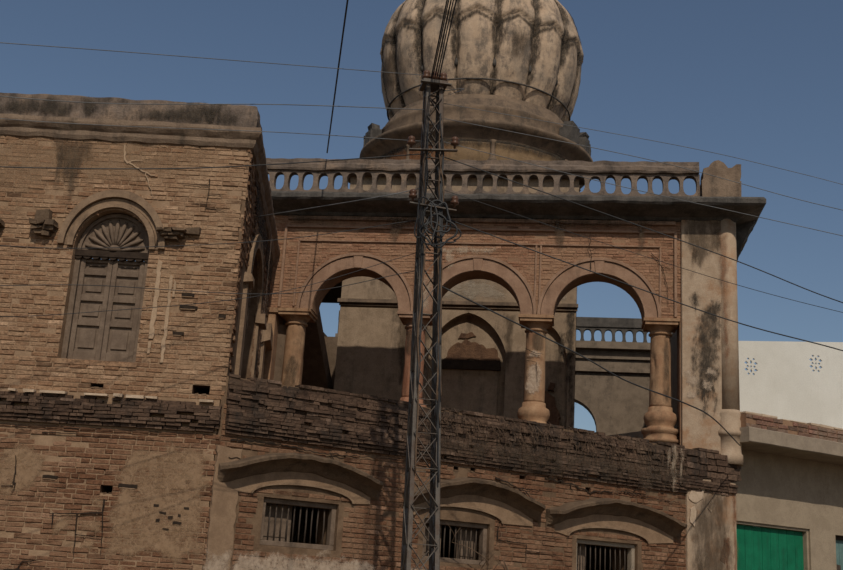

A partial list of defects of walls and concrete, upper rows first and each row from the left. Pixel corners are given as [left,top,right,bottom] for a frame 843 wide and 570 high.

damp [381,0,582,110]
crack [124,145,155,196]
damp [692,294,720,411]
peeling [0,444,58,495]
peeling [95,446,208,562]
peeling [204,550,374,570]